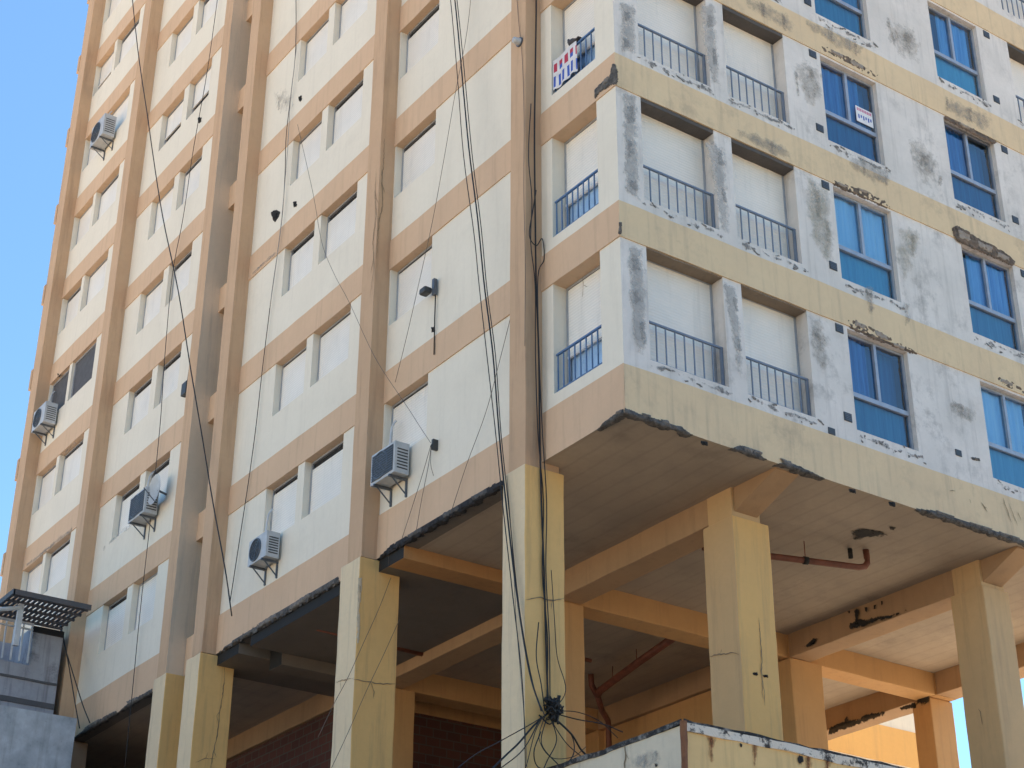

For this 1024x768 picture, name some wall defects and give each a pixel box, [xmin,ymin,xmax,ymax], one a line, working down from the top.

peeling [594,64,638,195]
spalling [833,180,890,209]
spalling [952,226,1015,266]
spalling [848,320,917,355]
spalling [597,408,708,446]
spalling [728,445,825,481]
spalling [915,508,1024,547]
crack [709,623,765,701]